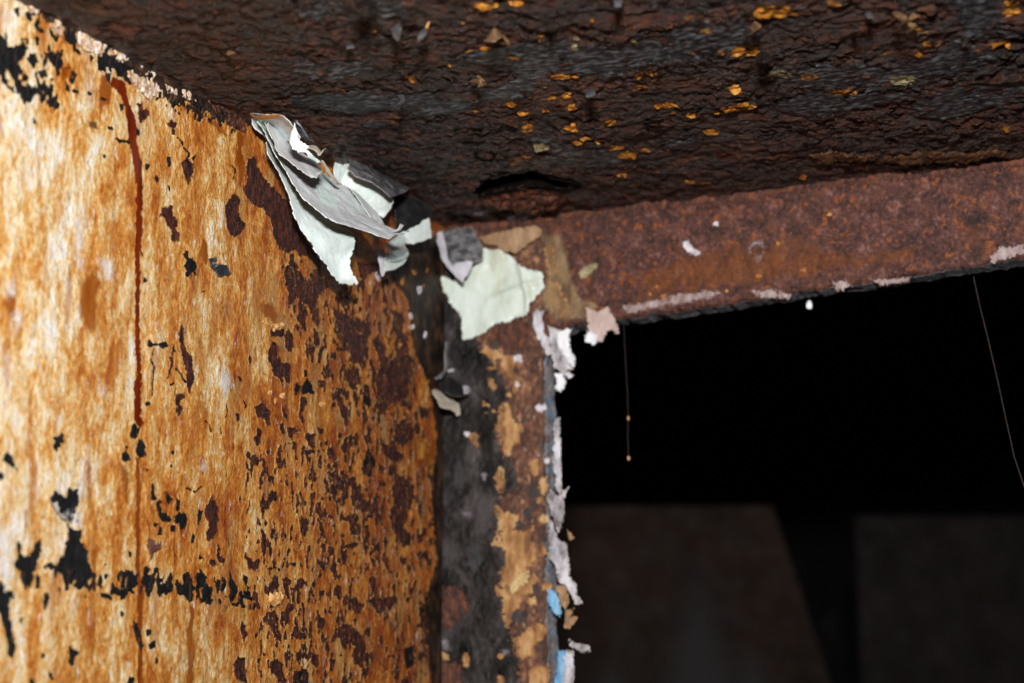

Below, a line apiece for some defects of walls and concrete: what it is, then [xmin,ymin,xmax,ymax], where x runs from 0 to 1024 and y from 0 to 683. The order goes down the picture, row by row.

rust [529,74,650,160]
rust [717,5,798,57]
rust [81,268,98,331]
rust [99,54,256,428]
peeling [119,82,576,570]
peeling [584,306,619,345]
rust [447,147,1024,321]
rust [121,457,144,683]
peeling [0,423,411,683]
rust [243,247,436,683]
peeling [403,646,415,669]
peeling [546,417,591,683]